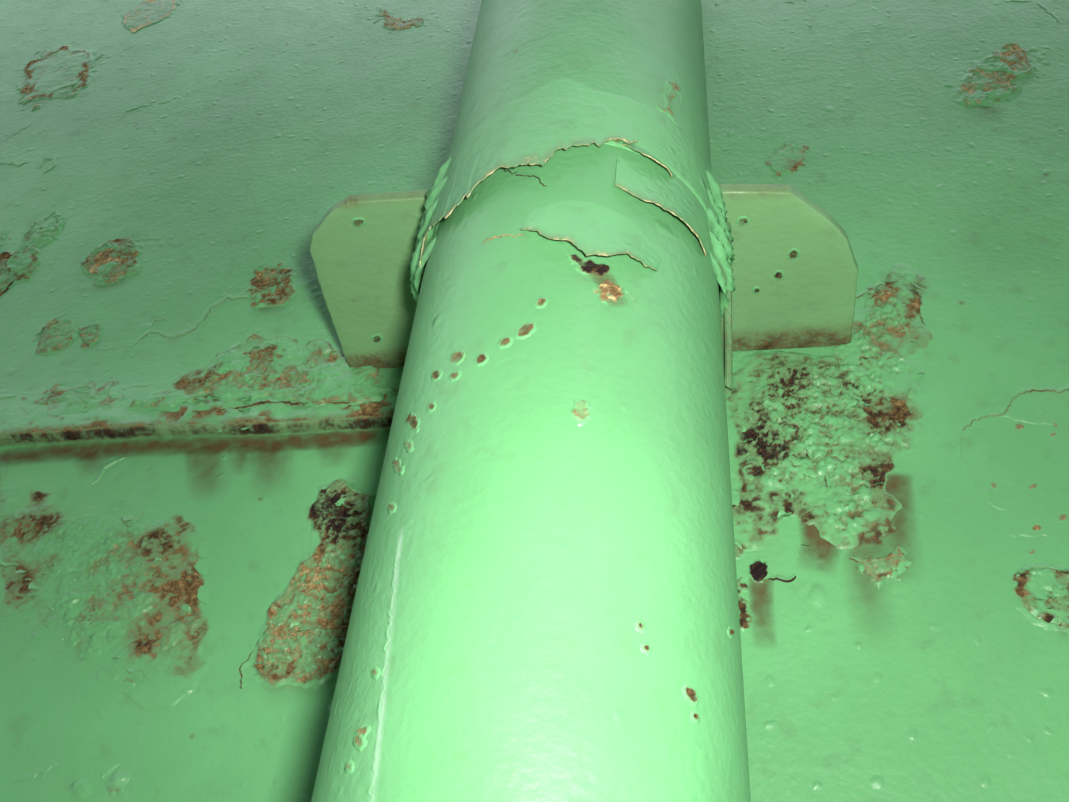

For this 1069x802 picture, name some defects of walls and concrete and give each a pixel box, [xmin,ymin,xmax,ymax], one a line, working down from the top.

spalling [944,43,1050,108]
peeling [419,79,713,266]
spalling [80,237,162,288]
crack [70,294,262,351]
spalling [126,333,399,432]
spalling [244,262,299,309]
hole [431,322,537,382]
peeling [483,200,661,278]
spalling [726,263,936,589]
crack [957,384,1069,538]
spalling [239,476,376,691]
spalling [1010,563,1069,633]